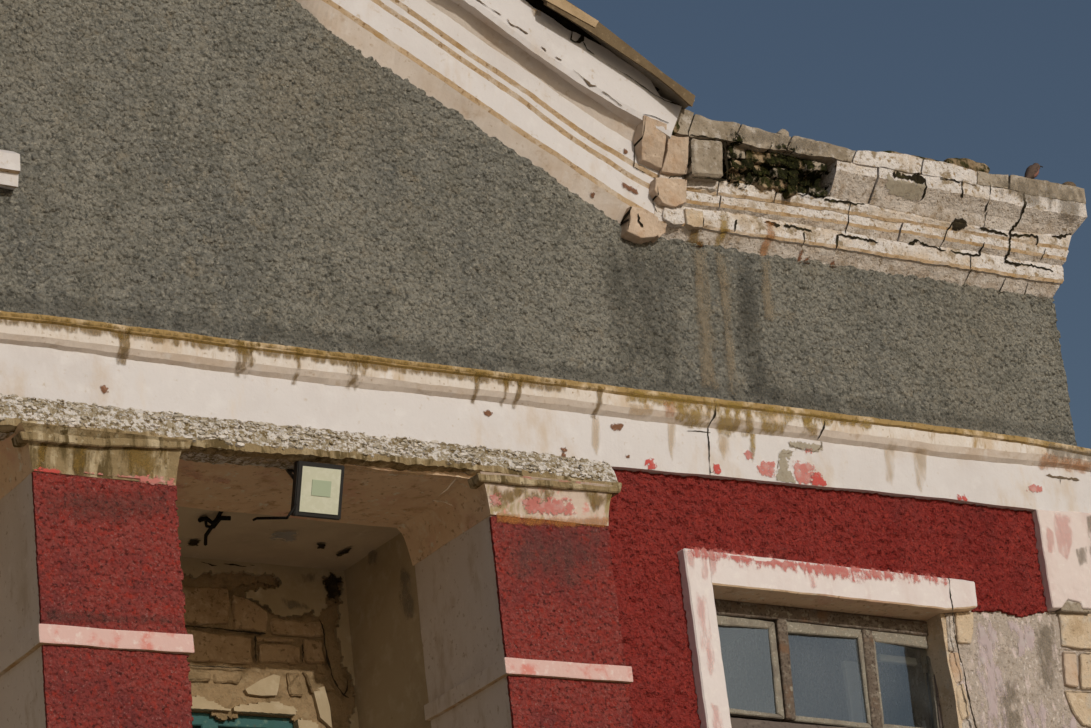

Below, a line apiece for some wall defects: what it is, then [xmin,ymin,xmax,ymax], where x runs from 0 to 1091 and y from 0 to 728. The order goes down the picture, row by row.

crack [478,0,729,229]
crack [909,178,1071,296]
water stain [0,314,566,407]
peeling [523,497,576,515]
crack [695,405,717,473]
water stain [628,391,872,457]
peeling [744,441,827,486]
peeling [691,547,947,585]
peeling [181,572,355,728]
crack [948,577,977,728]